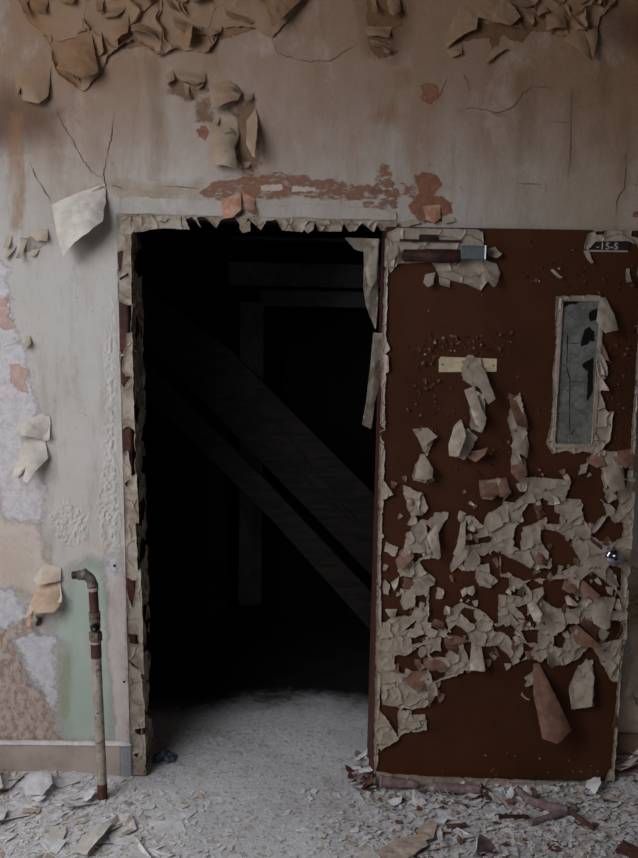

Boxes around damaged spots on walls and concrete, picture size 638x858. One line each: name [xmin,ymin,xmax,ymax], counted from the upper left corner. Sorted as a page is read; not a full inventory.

peeling [16,0,305,104]
flaking render [364,0,403,58]
peeling [446,0,616,64]
crack [57,110,122,198]
peeling [0,184,106,627]
peeling [116,68,638,787]